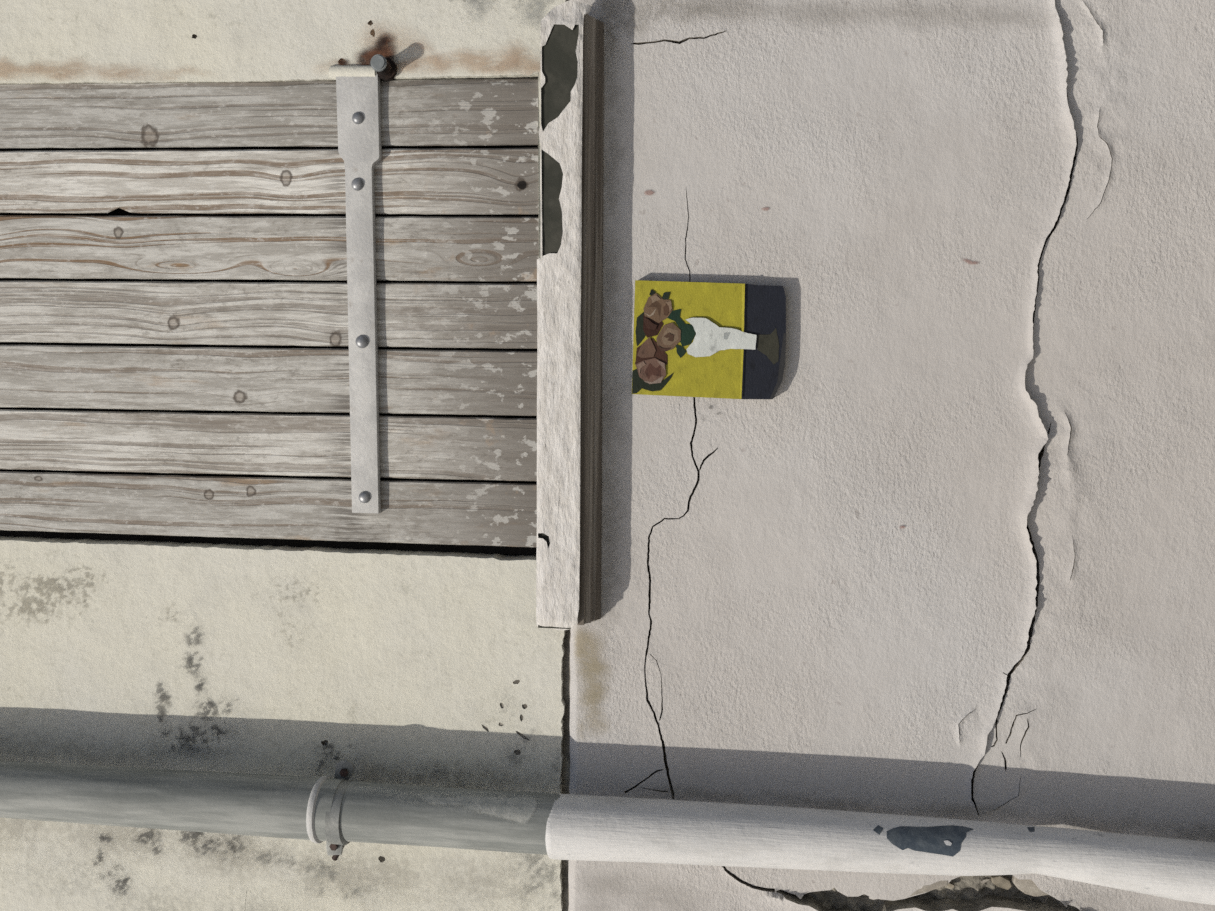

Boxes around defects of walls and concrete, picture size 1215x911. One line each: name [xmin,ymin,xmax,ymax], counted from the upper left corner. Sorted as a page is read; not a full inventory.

corrosion [339,35,394,65]
peeling [541,24,579,131]
crack [632,31,726,45]
peeling [541,149,563,256]
crack [684,191,692,282]
crack [958,0,1113,816]
crack [624,397,718,799]
leakage [156,628,229,751]
leakage [94,836,129,895]
leakage [136,829,159,854]
leakage [180,831,243,859]
flaking render [722,866,1080,911]